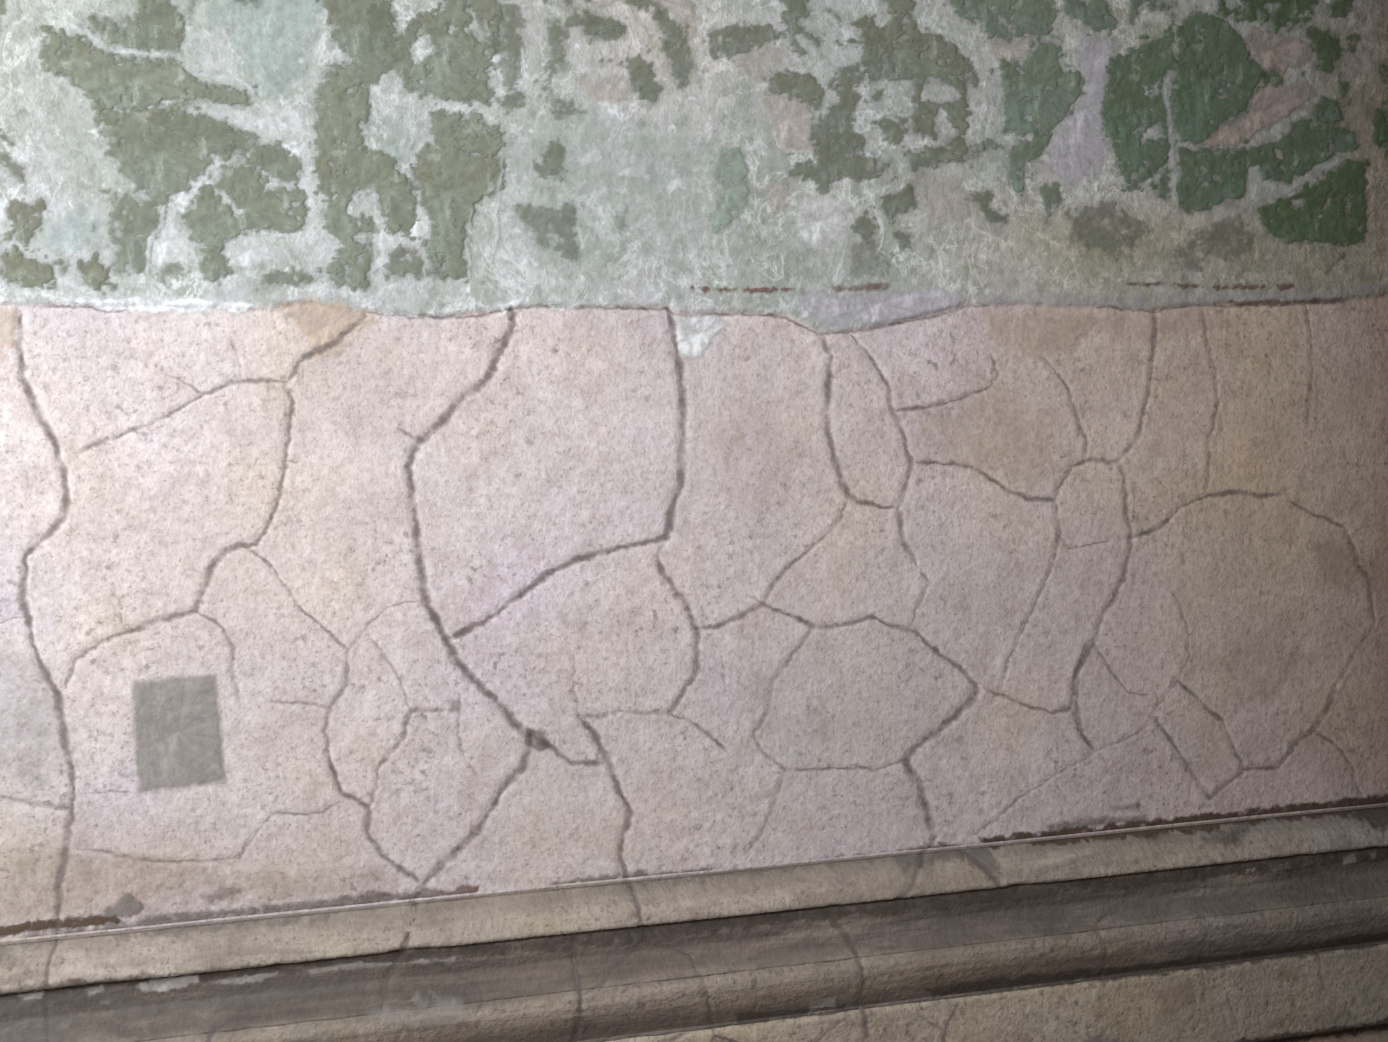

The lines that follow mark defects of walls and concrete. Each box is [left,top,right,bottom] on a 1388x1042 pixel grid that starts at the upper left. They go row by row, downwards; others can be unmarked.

peeling [0,0,525,357]
peeling [533,139,564,181]
peeling [548,0,625,71]
peeling [600,0,691,102]
peeling [708,0,1388,274]
crack [92,327,353,648]
crack [766,314,1086,661]
crack [1110,330,1268,603]
crack [18,317,135,983]
crack [323,308,807,996]
crack [845,611,1092,822]
crack [815,916,867,1042]